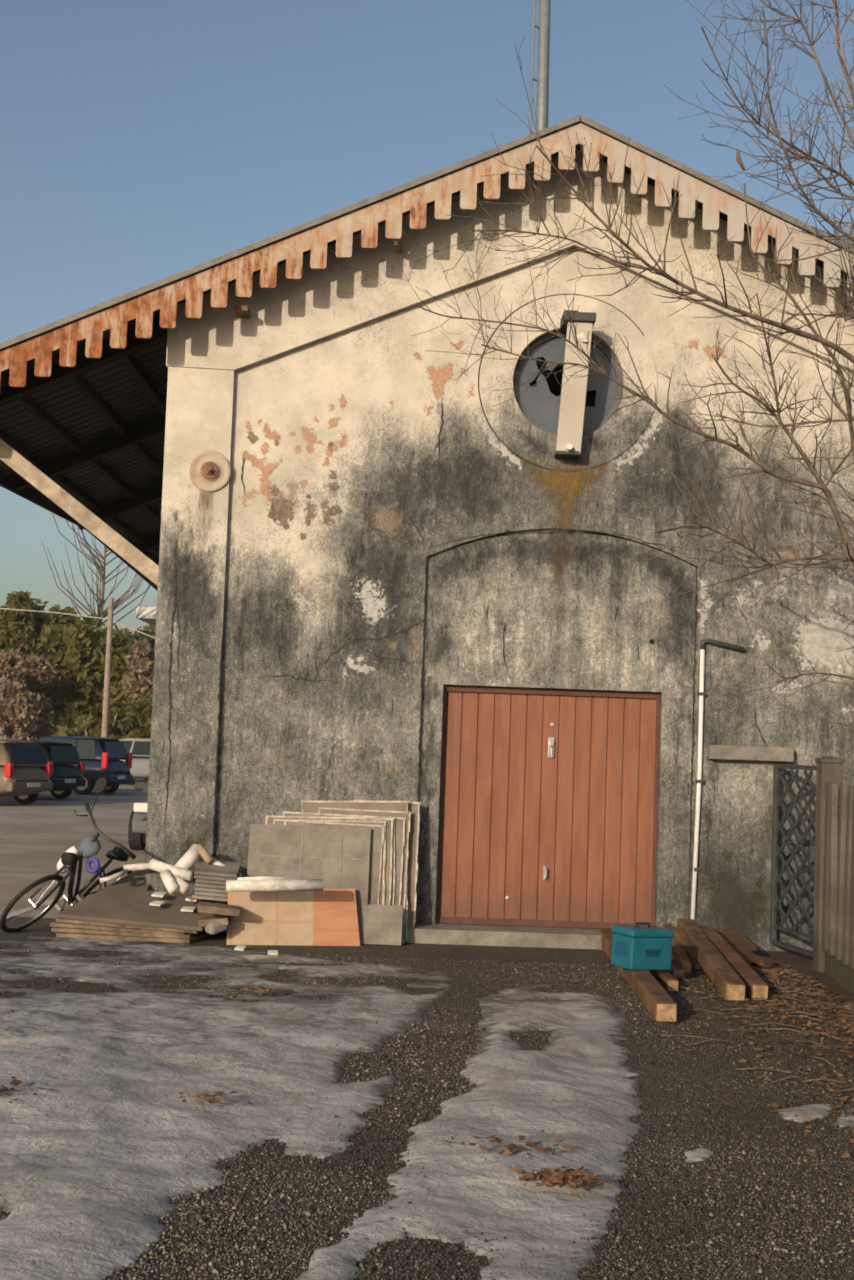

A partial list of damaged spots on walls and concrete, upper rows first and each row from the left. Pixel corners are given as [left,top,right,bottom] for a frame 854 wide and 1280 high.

peeling [688,340,726,361]
peeling [413,341,525,470]
peeling [242,395,357,539]
peeling [371,506,407,537]
flaking render [291,591,316,620]
flaking render [350,577,399,632]
water stain [348,549,406,654]
water stain [433,539,687,650]
flaking render [341,654,377,681]